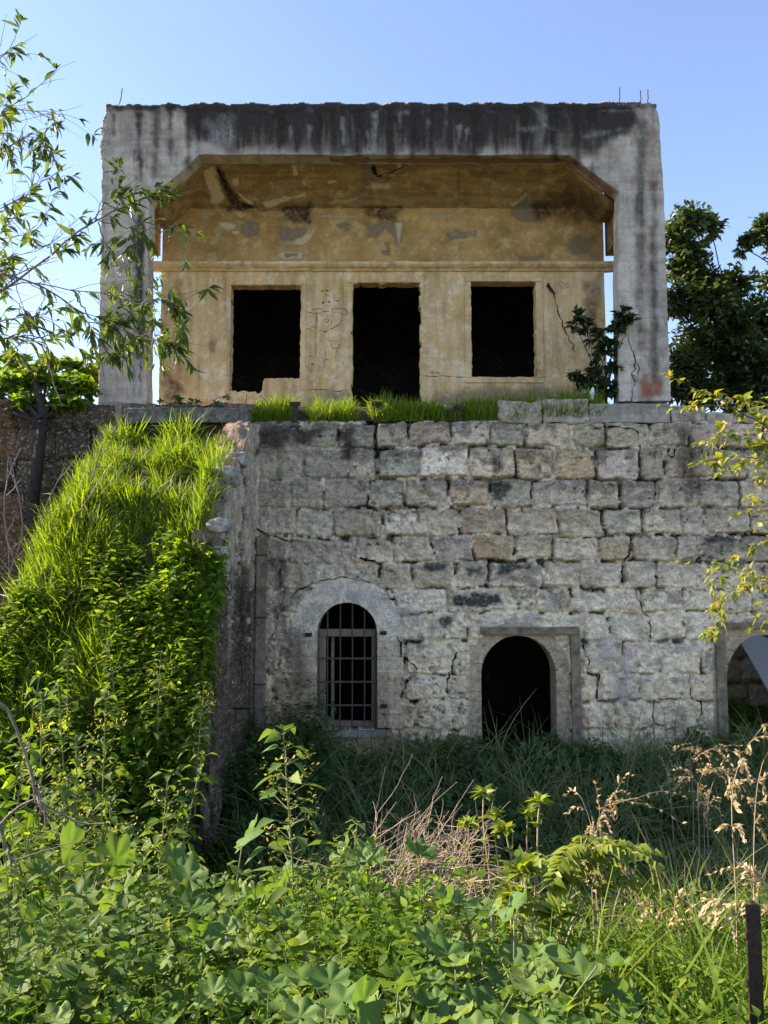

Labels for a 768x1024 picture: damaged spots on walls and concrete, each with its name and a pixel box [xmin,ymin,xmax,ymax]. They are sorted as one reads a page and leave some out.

crack [215,165,254,211]
peeling [219,221,259,238]
peeling [203,164,307,208]
damp [281,202,312,224]
damp [106,102,656,216]
peeling [278,158,613,260]
crack [546,283,575,352]
crack [628,333,640,401]
crack [397,637,417,698]
crack [582,643,600,699]